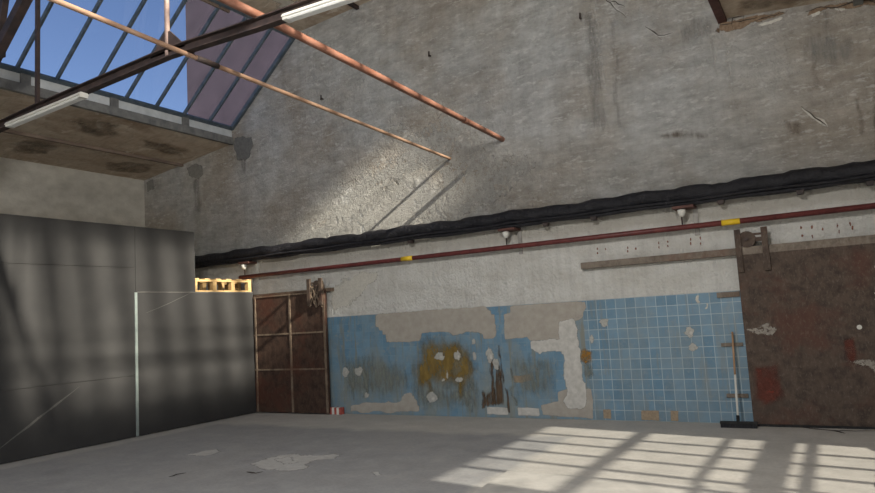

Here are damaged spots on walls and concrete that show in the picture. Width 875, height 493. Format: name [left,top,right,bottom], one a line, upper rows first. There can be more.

spalling [716,11,784,33]
crack [806,0,875,12]
spalling [808,0,875,17]
peeling [375,301,586,370]
rust [418,343,471,396]
rust [581,350,592,377]
flaking render [351,391,438,413]
peeling [487,389,611,419]